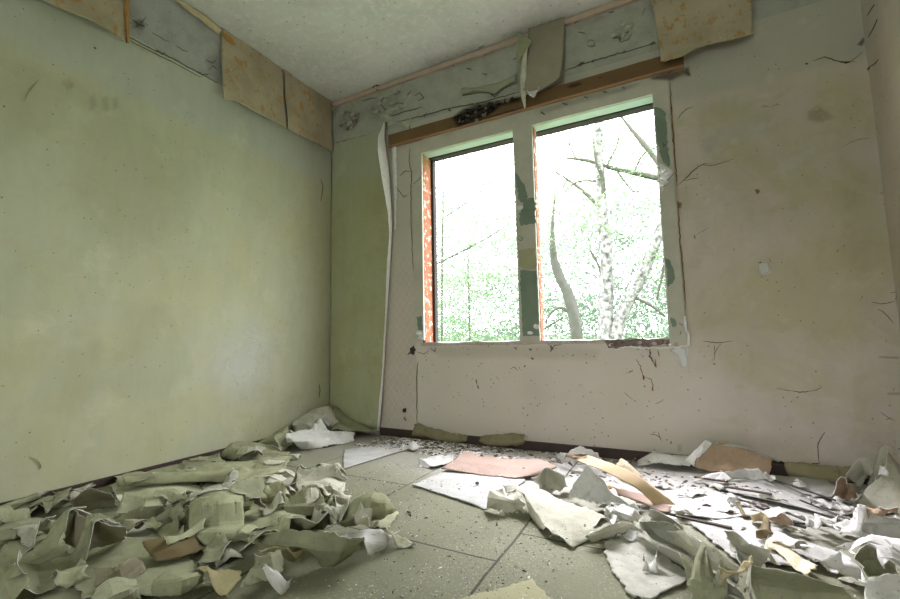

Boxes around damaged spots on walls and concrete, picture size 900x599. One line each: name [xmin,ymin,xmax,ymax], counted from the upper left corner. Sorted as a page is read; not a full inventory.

crack [130,37,218,83]
crack [805,5,879,70]
crack [679,159,733,184]